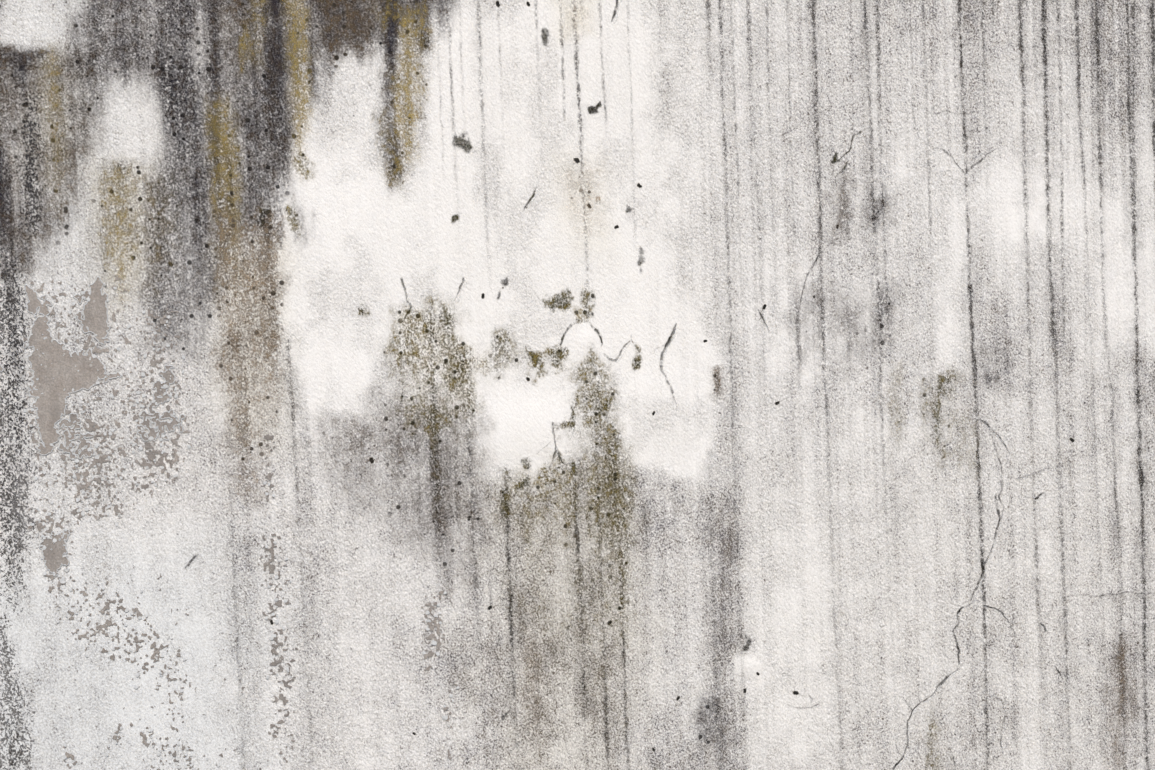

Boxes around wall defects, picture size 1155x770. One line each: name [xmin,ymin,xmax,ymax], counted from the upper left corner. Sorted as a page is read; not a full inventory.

damp [1041,0,1063,221]
peeling [17,266,255,770]
damp [0,0,453,770]
damp [431,466,462,566]
crack [893,420,1042,770]
damp [968,276,990,650]
damp [1135,315,1146,671]